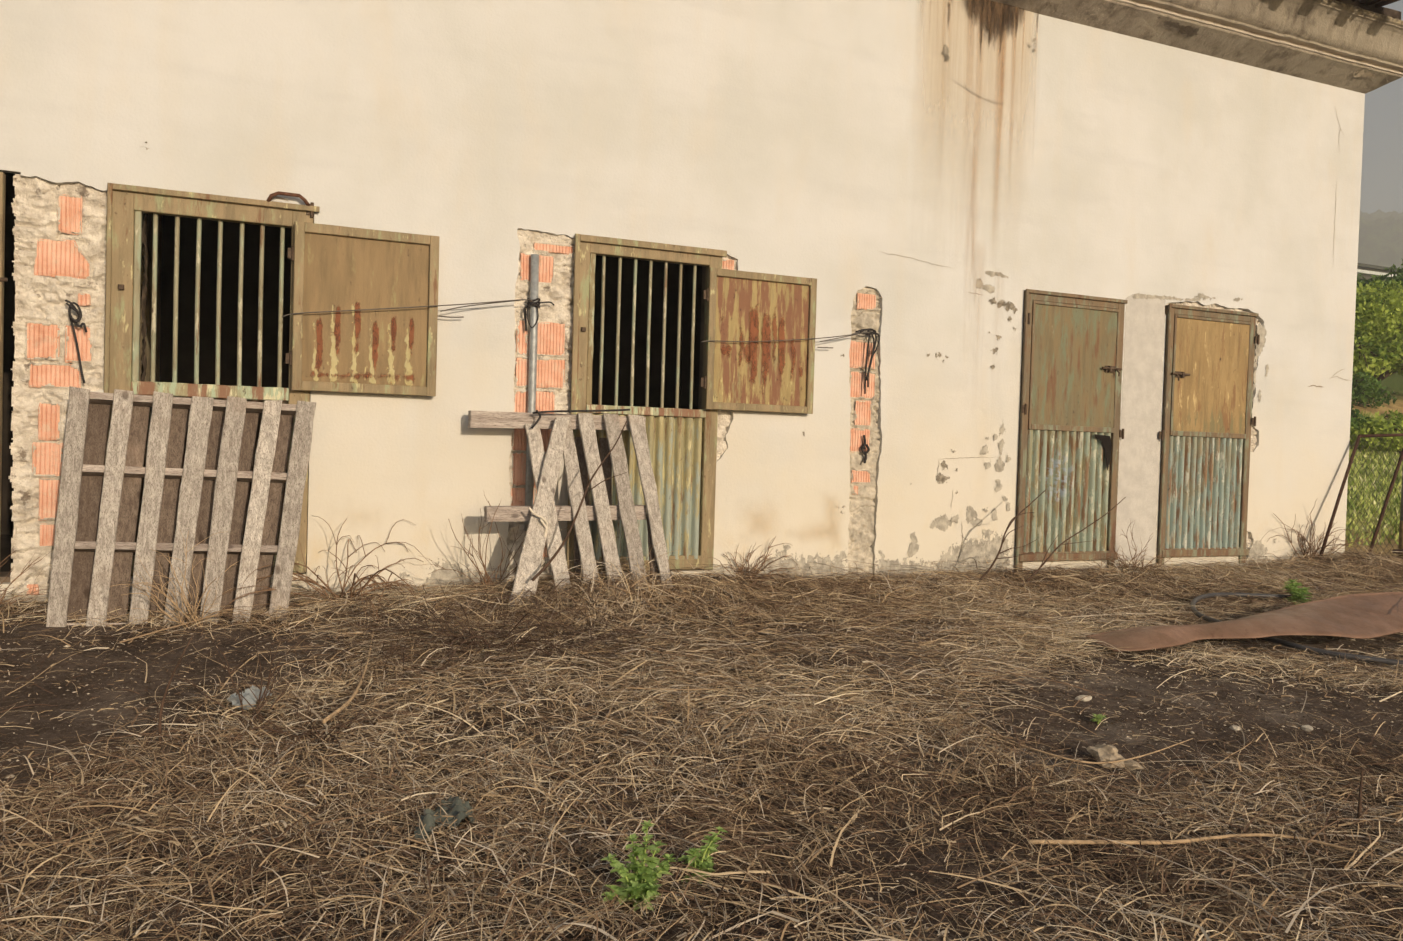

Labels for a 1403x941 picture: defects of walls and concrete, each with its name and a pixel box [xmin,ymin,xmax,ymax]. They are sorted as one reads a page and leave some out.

damp [926,0,1039,92]
flaking render [8,174,107,601]
corrosion [310,302,414,381]
flaking render [373,229,575,593]
corrosion [721,304,803,394]
flaking render [737,287,1013,582]
peeling [976,271,1018,369]